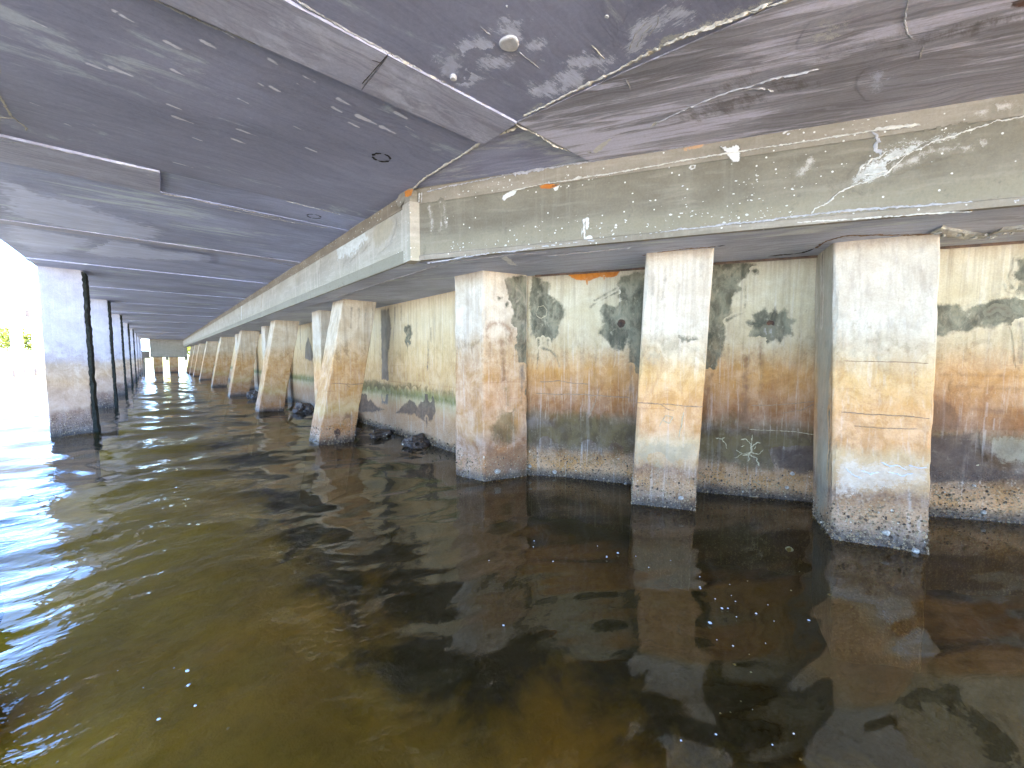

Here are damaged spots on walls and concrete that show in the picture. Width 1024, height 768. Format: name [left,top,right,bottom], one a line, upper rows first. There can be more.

leakage [154,0,264,48]
leakage [296,0,920,192]
crack [651,10,866,127]
crack [856,0,924,98]
crack [811,115,1024,214]
leakage [527,276,568,371]
rust [568,271,621,285]
leakage [587,270,645,405]
leakage [701,262,801,425]
leakage [937,255,1024,369]